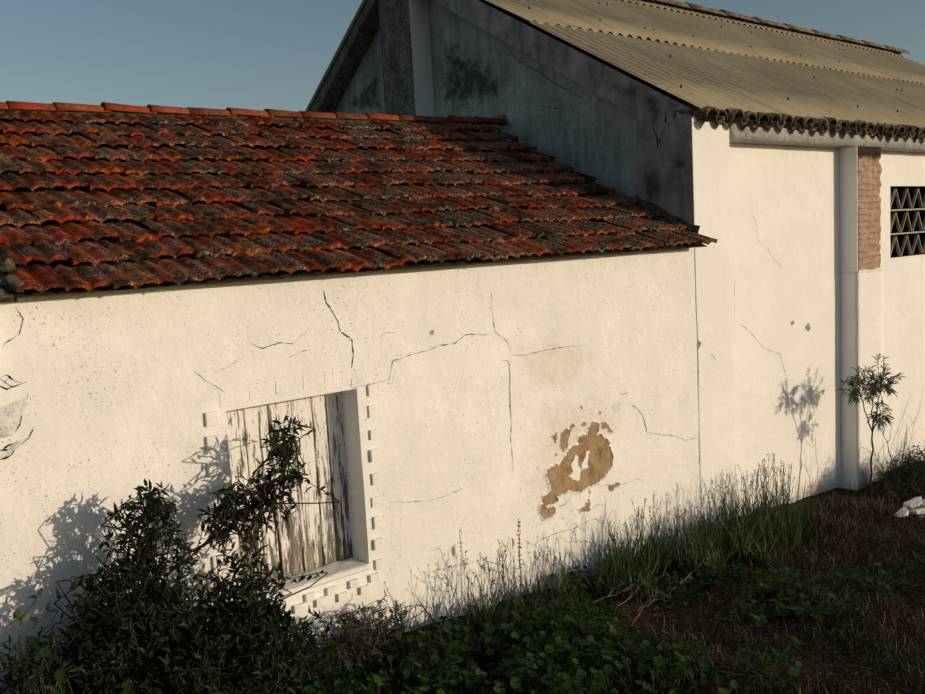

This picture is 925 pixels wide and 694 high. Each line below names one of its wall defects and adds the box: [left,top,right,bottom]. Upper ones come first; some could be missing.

crack [0,375,35,460]
crack [324,294,580,487]
peeling [537,402,621,522]
crack [621,392,700,470]